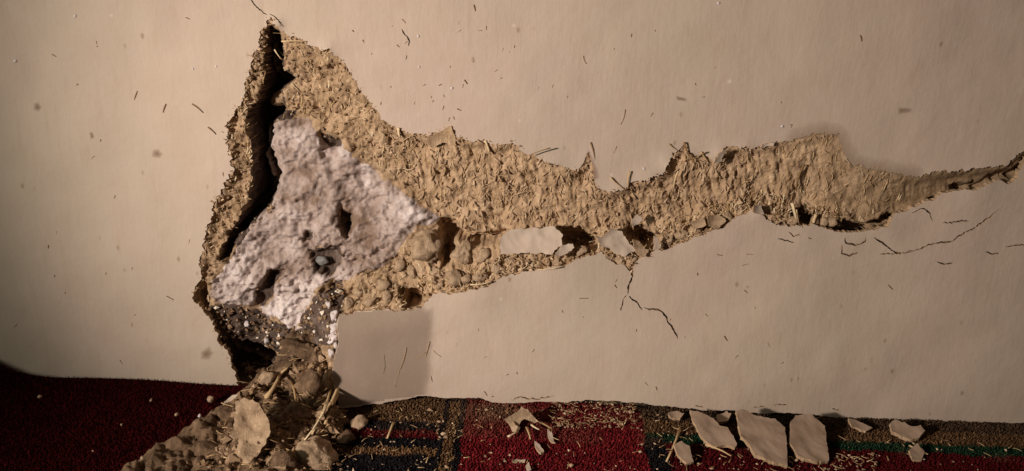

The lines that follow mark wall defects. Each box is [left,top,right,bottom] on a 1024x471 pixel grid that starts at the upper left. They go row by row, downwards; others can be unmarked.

flaking render [192,13,1024,405]
crack [841,208,991,265]
crack [620,269,678,338]